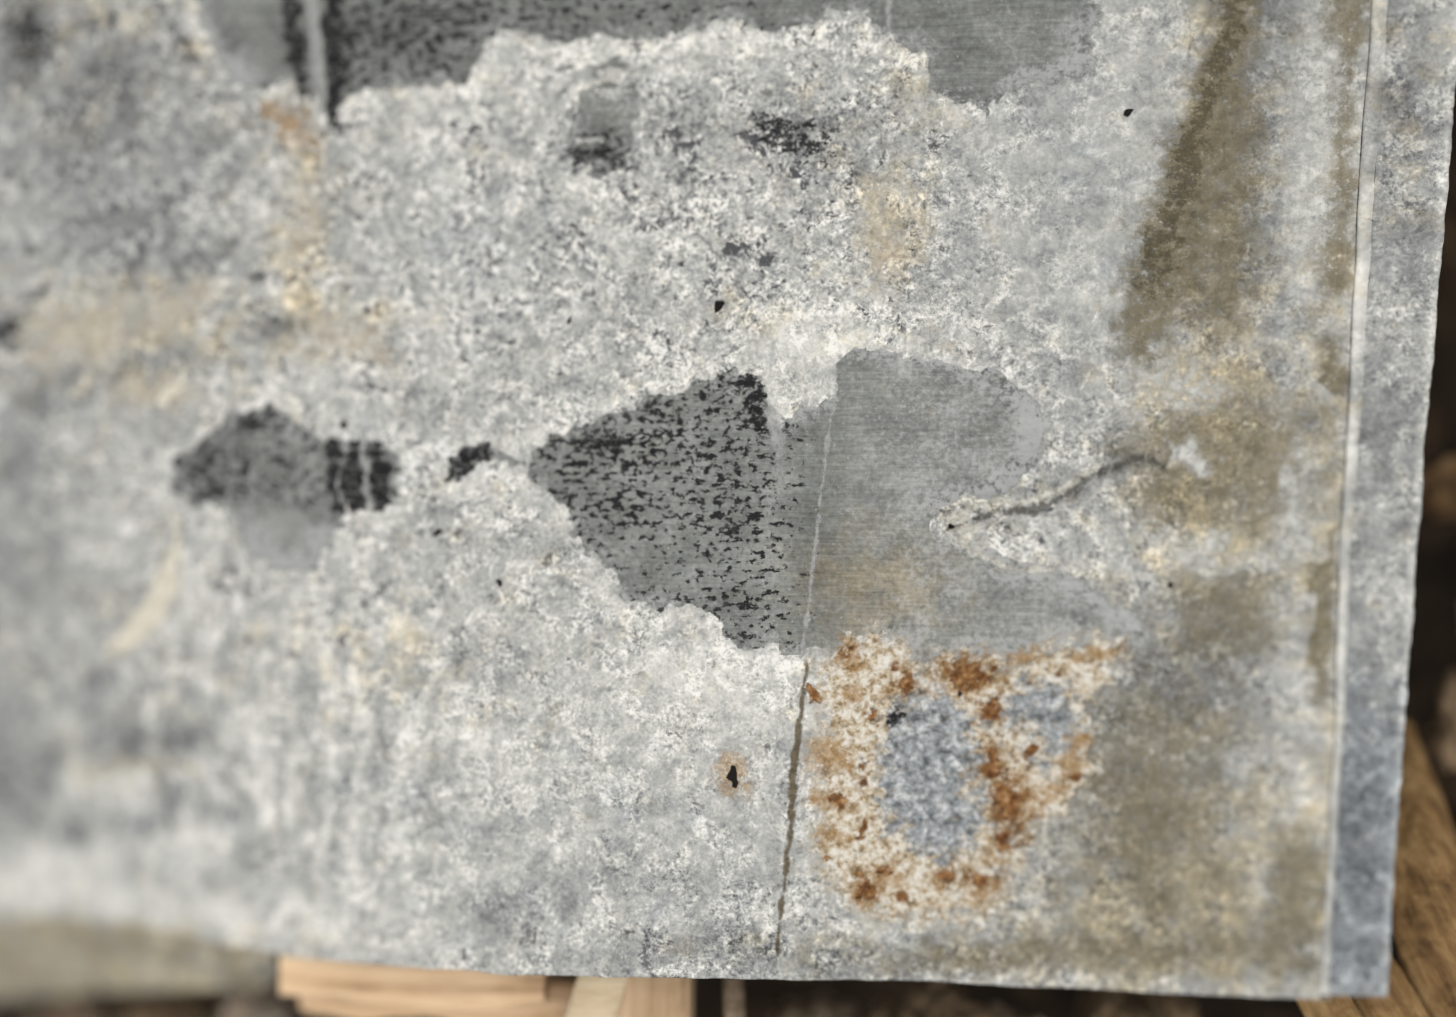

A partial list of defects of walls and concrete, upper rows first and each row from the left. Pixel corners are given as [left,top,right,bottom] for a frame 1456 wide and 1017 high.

peeling [197,0,1101,179]
water stain [1113,0,1257,410]
water stain [1278,0,1364,294]
peeling [171,402,402,572]
peeling [442,347,1159,672]
crack [934,454,1165,575]
water stain [1318,340,1346,396]
crack [776,663,808,953]
rust [804,614,1129,932]